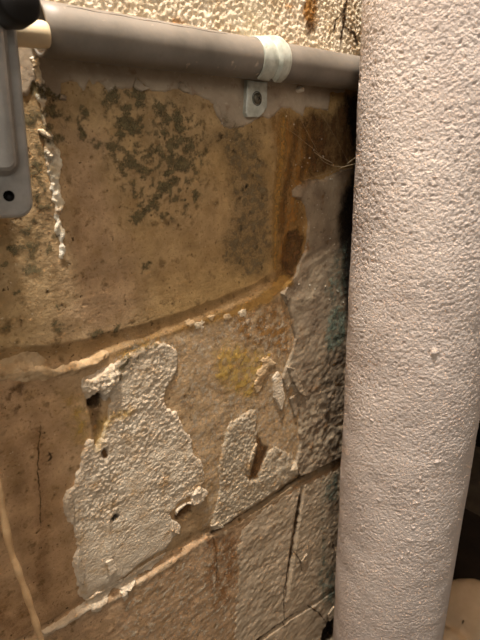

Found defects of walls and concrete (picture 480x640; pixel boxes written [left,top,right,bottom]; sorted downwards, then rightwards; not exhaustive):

crack [333,0,358,45]
mould [7,82,208,274]
peeling [18,47,345,259]
mould [220,126,271,275]
rust [306,103,354,175]
spalling [81,363,120,427]
peeling [234,168,354,640]
crack [208,504,258,579]
crack [256,465,304,640]